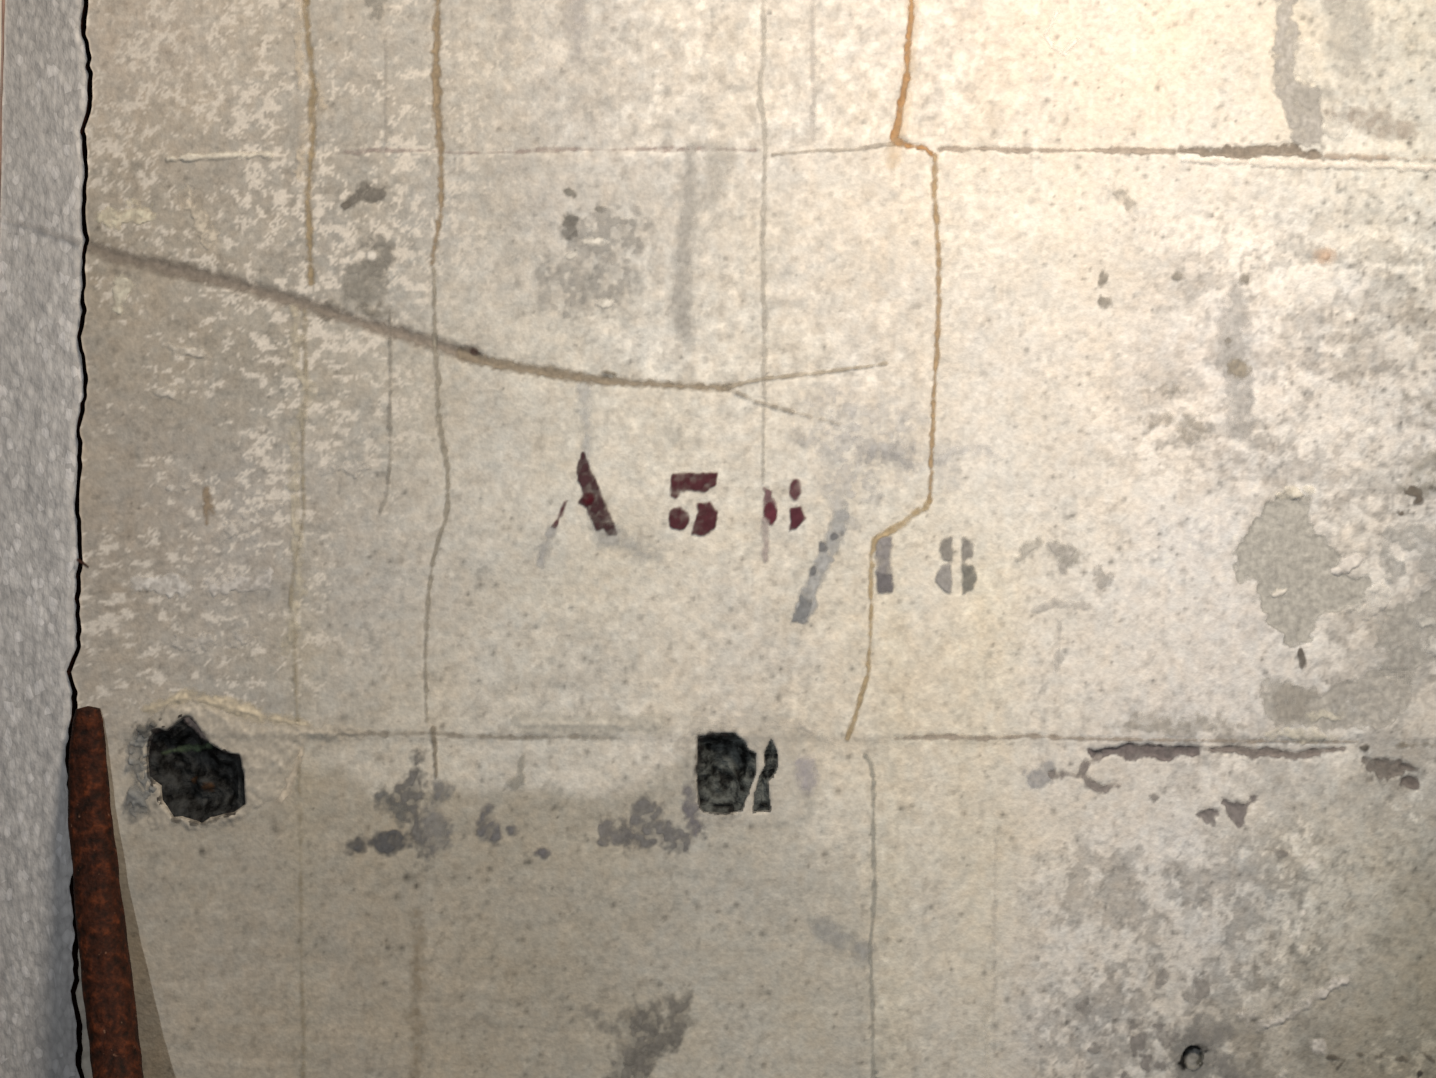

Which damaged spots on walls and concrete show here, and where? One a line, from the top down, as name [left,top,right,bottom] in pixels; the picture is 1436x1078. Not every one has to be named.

crack [70,875,85,1078]
corrosion [68,706,144,1078]
crack [21,0,887,786]
crack [845,0,941,1078]